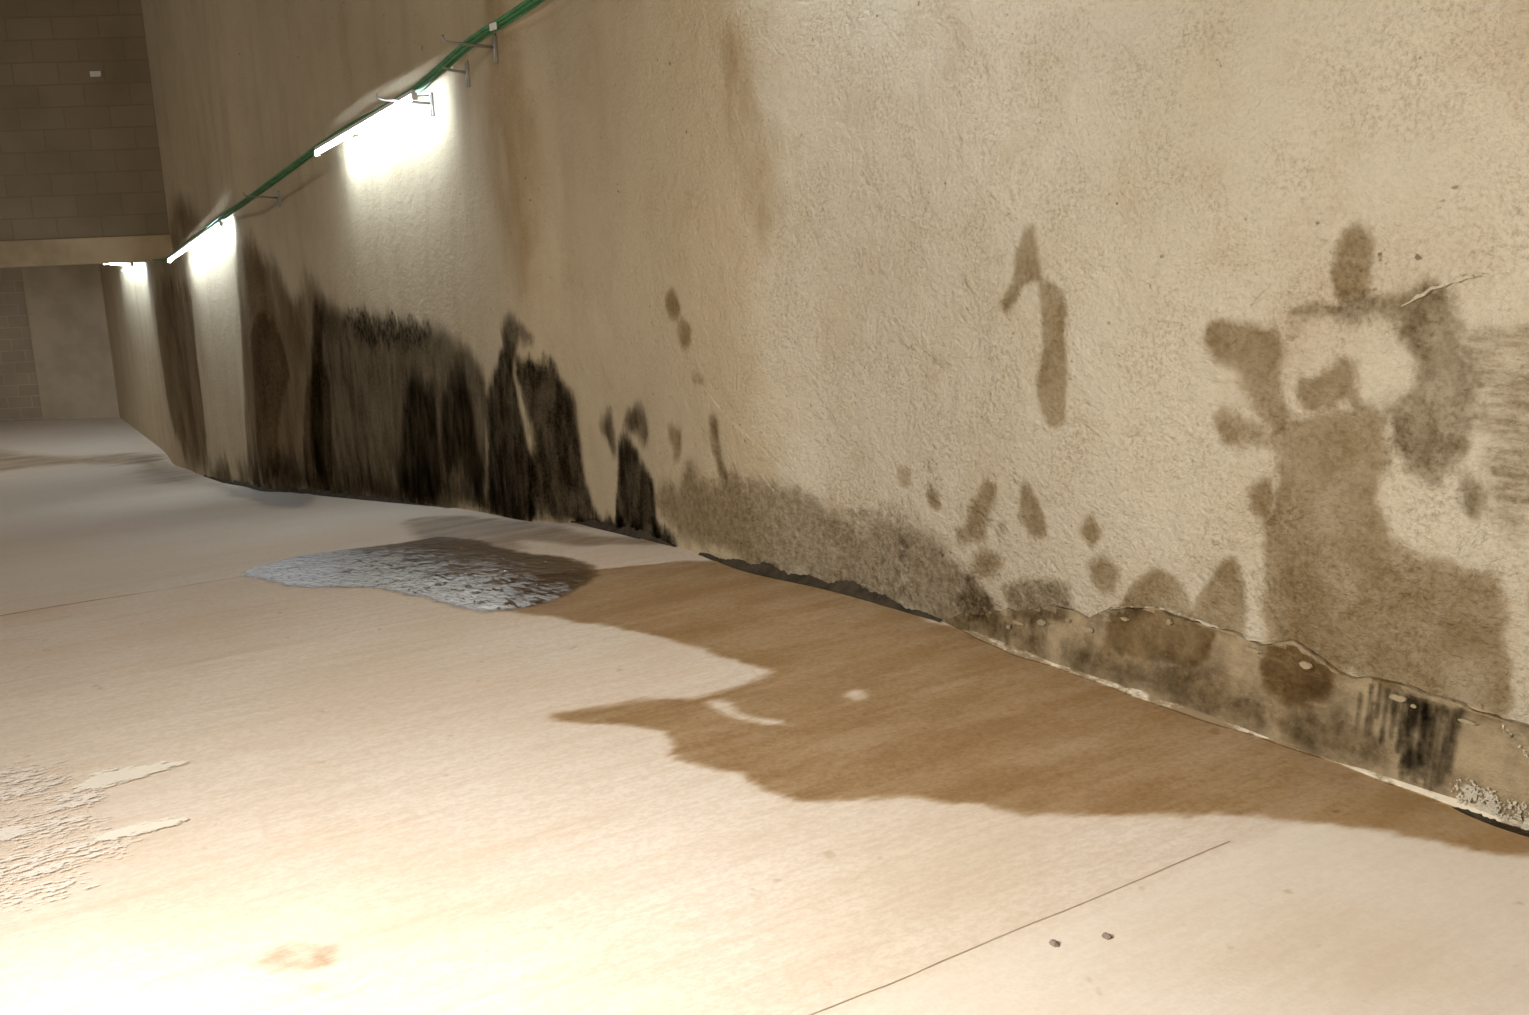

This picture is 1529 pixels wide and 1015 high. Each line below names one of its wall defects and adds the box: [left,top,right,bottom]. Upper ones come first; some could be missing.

damp [205,252,675,545]
damp [1365,687,1529,830]